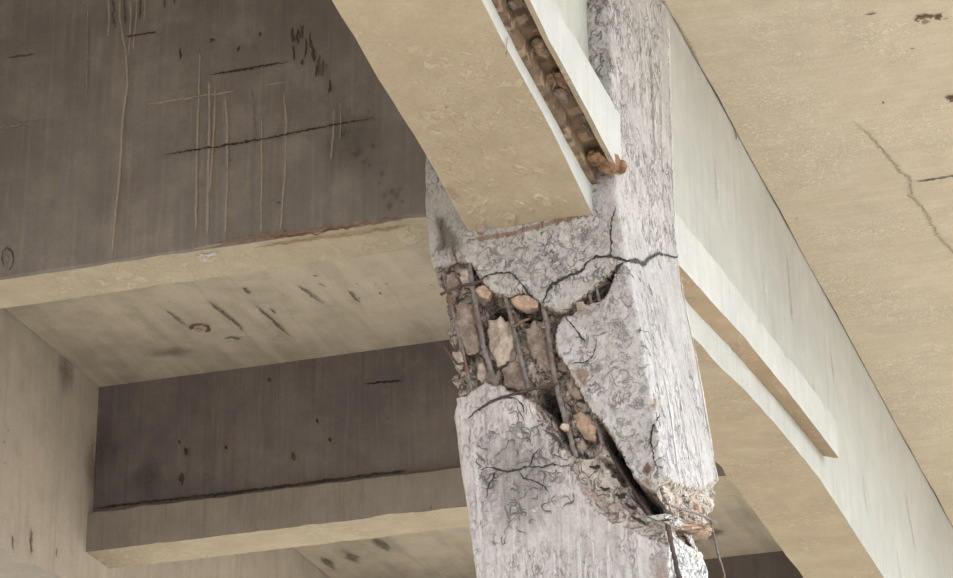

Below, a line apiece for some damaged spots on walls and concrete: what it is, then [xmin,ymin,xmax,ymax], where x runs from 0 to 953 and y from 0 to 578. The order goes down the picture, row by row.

crack [209,61,288,75]
crack [162,117,373,156]
crack [855,125,953,253]
crack [482,205,679,303]
crack [564,316,597,365]
spalling [433,230,726,578]
crack [481,448,561,498]